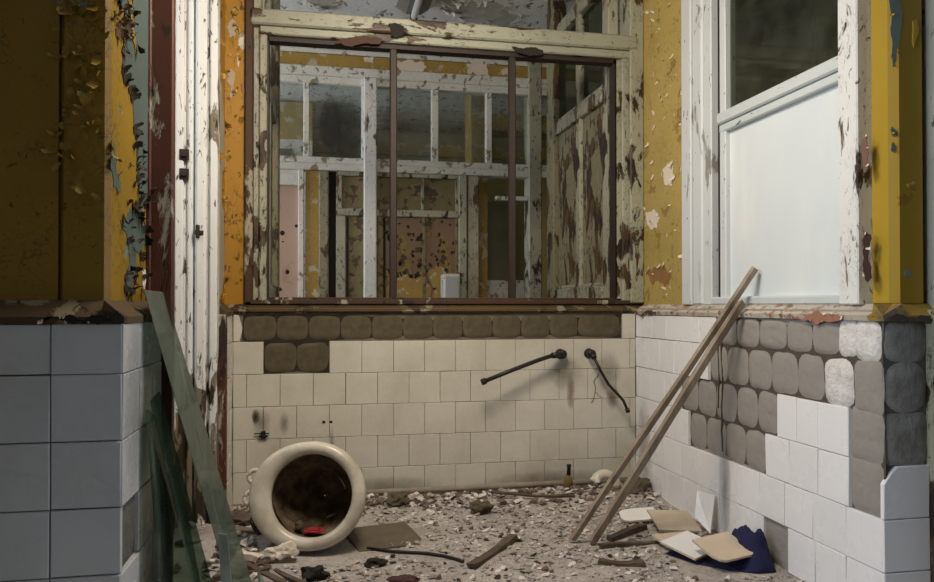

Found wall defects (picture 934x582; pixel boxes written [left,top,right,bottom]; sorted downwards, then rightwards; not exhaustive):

peeling [301,0,344,13]
peeling [889,0,919,67]
peeling [41,0,157,301]
peeling [890,127,898,153]
peeling [862,232,872,283]
peeling [682,311,933,518]